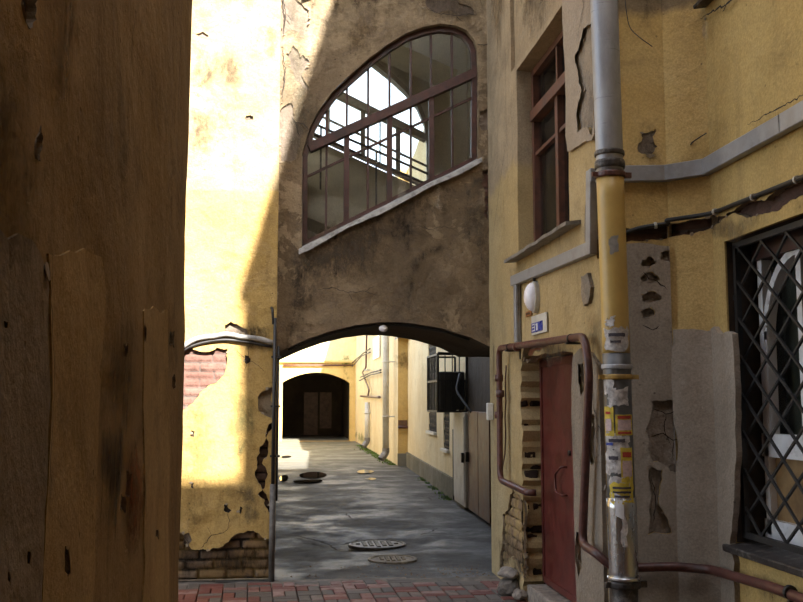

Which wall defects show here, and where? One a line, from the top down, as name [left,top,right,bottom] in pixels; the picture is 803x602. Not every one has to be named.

spalling [21,0,37,29]
peeling [281,0,311,39]
crack [700,0,732,20]
peeling [287,45,310,91]
peeling [578,25,593,129]
crack [747,95,803,125]
spalling [637,129,657,158]
flaking render [626,180,803,602]
peeling [142,306,276,602]
flaking render [524,452,541,478]
flaking render [500,490,546,584]